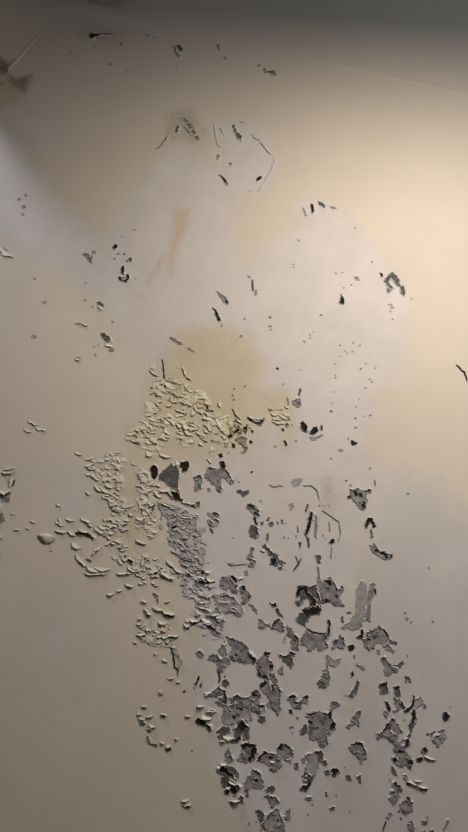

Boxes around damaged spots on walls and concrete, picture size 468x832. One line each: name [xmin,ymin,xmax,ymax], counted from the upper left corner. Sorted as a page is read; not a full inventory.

peeling [0,468,15,523]
damp [87,318,301,556]
flaking render [55,115,451,832]